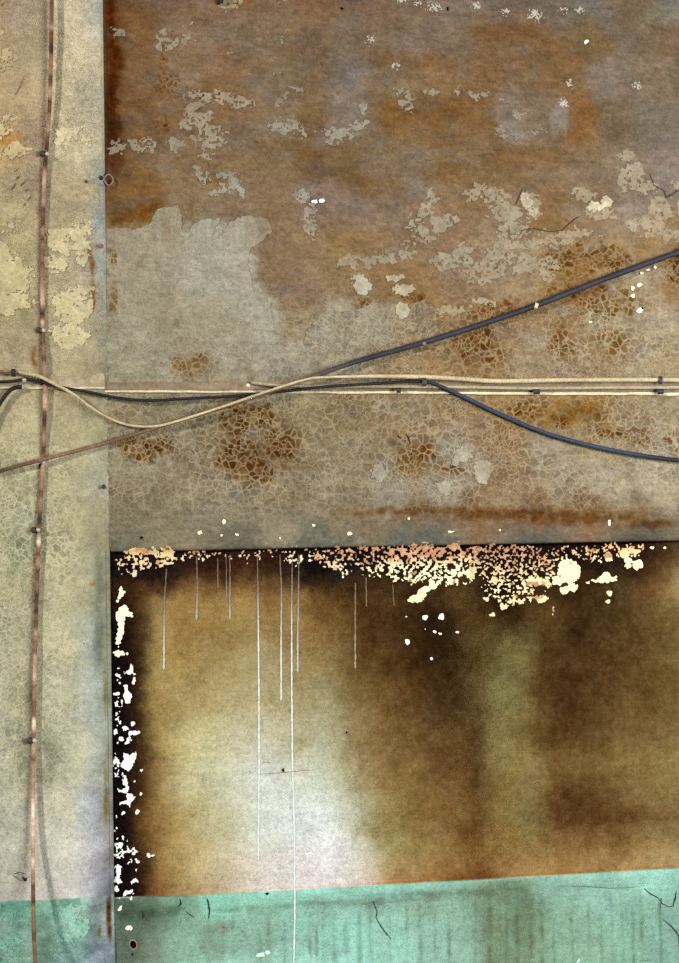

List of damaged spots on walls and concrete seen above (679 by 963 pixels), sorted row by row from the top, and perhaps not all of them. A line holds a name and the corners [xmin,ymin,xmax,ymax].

peeling [0,114,33,160]
peeling [43,126,91,147]
peeling [0,221,94,316]
spalling [115,149,679,357]
rust [549,244,627,270]
peeling [46,285,95,350]
rust [124,439,171,460]
rust [218,408,292,481]
peeling [113,531,666,911]
leakage [134,542,679,963]